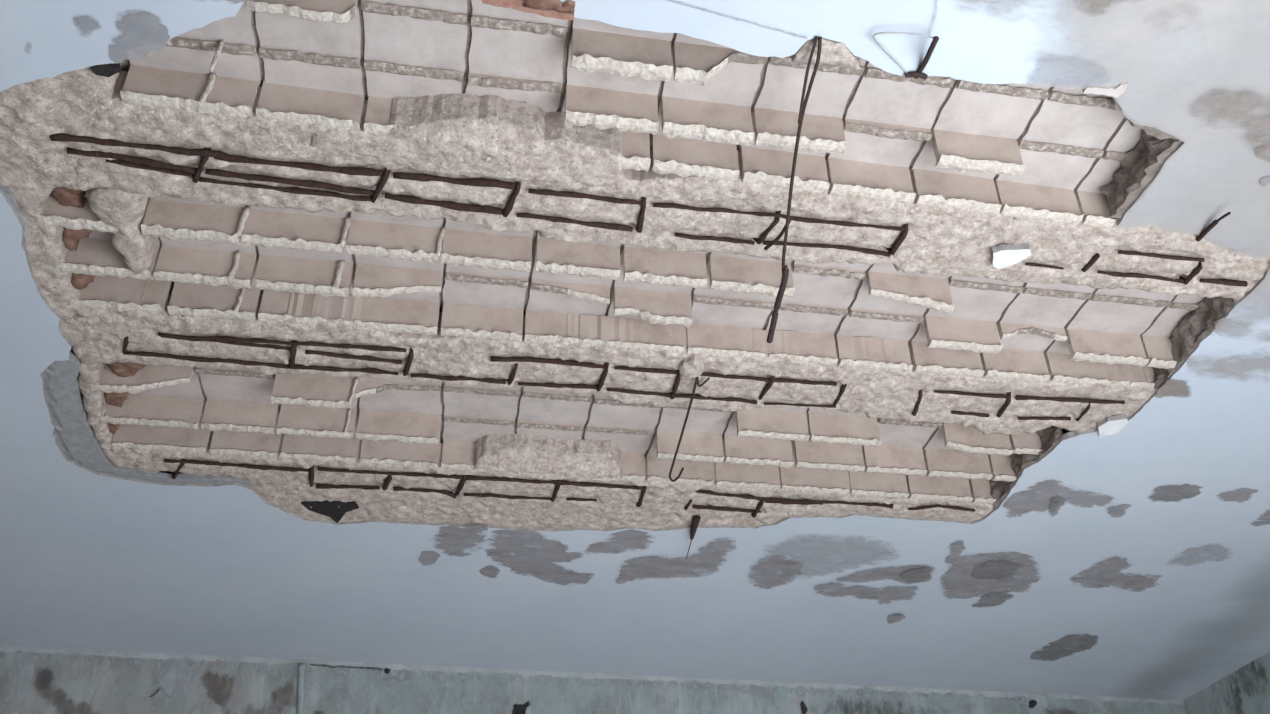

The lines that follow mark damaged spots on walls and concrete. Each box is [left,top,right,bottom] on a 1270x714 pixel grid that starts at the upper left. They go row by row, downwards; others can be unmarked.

water stain [1049,0,1270,331]
spalling [0,0,1270,557]
water stain [1187,359,1270,375]
water stain [1155,379,1189,398]
peeling [418,551,440,565]
peeling [479,565,500,578]
peeling [485,530,593,585]
peeling [616,538,735,584]
peeling [750,557,802,589]